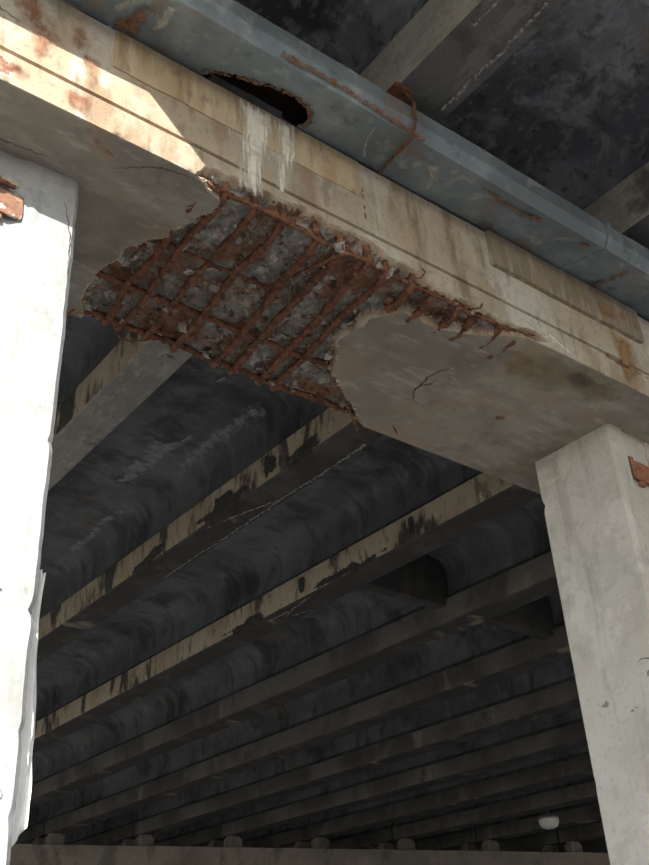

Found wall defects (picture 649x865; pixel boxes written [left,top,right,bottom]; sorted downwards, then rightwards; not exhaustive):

rust [19,0,55,55]
rust [69,92,88,107]
rust [281,51,425,141]
water stain [239,98,295,195]
spalling [68,165,552,432]
crack [406,368,449,403]